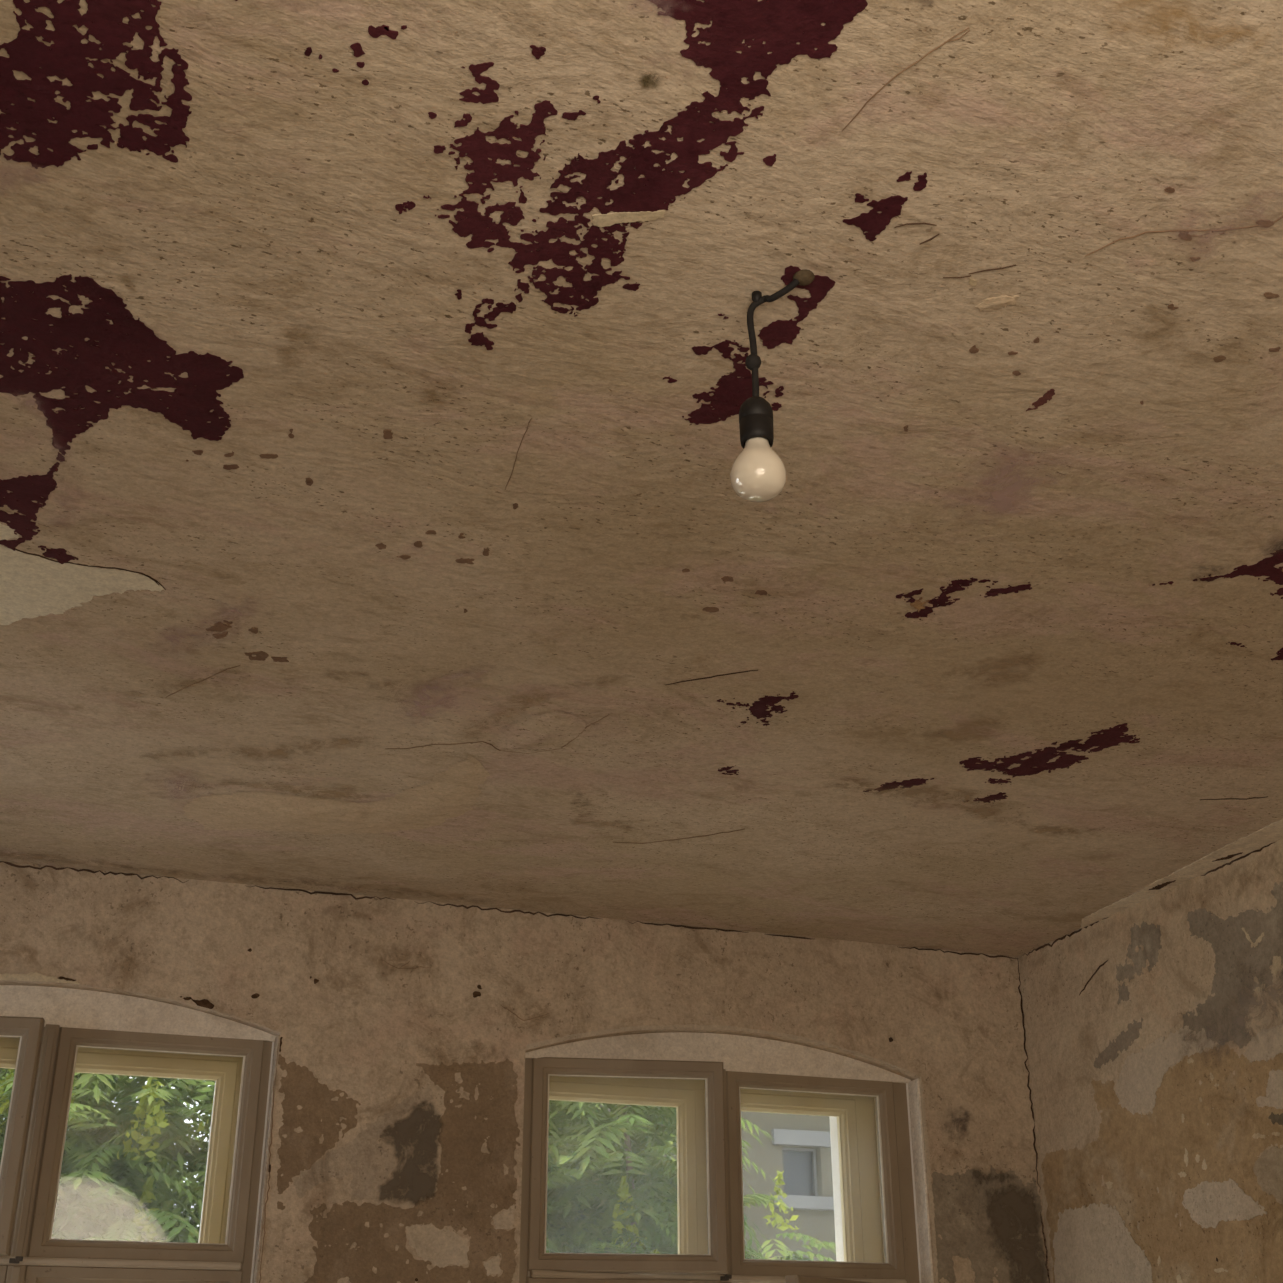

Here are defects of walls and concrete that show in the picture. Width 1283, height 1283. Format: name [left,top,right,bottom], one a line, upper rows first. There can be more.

peeling [0,0,192,169]
peeling [395,0,868,350]
peeling [842,171,927,241]
crack [1085,216,1283,257]
peeling [682,266,835,425]
peeling [0,274,244,625]
peeling [896,577,1032,620]
peeling [959,723,1140,804]
peeling [268,1037,361,1210]
peeling [304,1058,521,1283]
leakage [973,1170,1045,1283]
peeling [931,882,1283,1283]